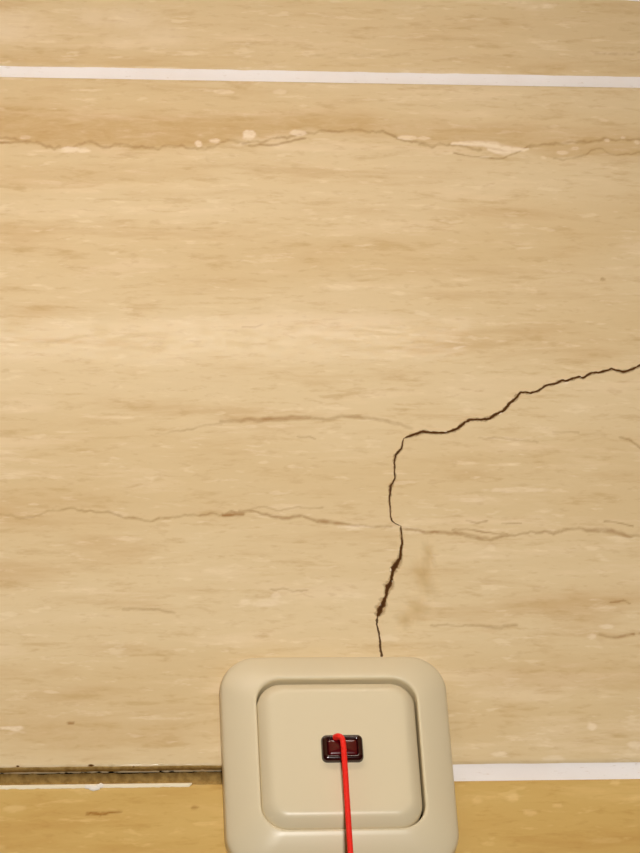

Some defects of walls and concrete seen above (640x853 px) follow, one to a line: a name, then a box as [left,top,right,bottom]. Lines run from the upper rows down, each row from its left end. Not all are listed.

crack [375,364,640,657]